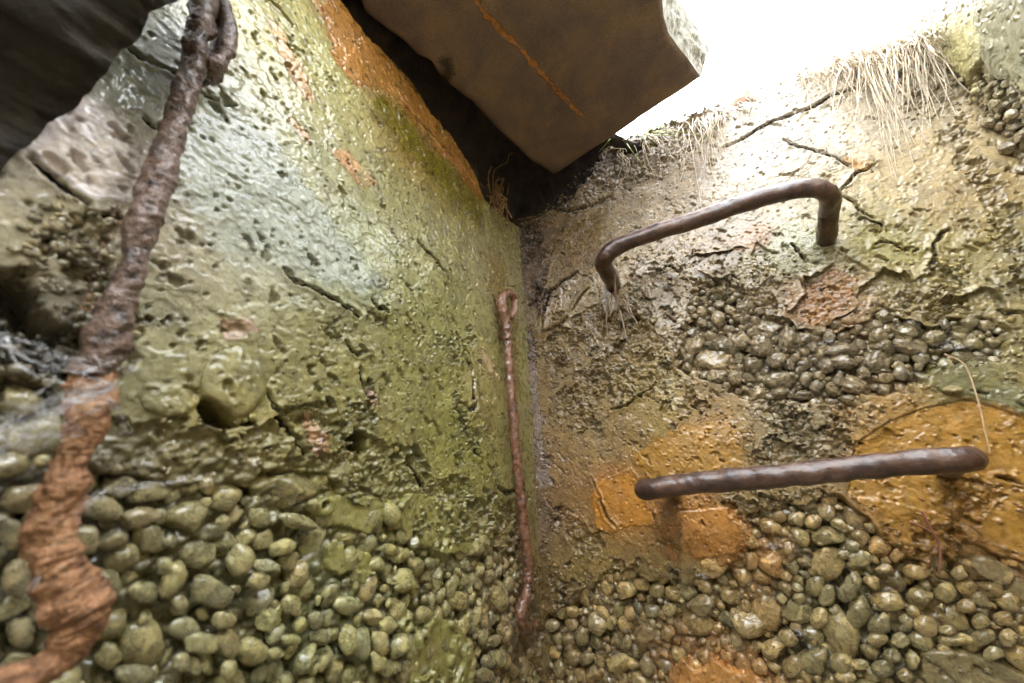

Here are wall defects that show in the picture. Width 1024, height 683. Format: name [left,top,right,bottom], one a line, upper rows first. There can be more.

corrosion [0,0,238,683]
corrosion [221,318,259,340]
crack [283,269,384,318]
corrosion [315,0,484,198]
corrosion [730,223,771,250]
crack [725,88,949,271]
spalling [669,249,1011,406]
spalling [0,376,62,667]
corrosion [484,254,539,637]
spalling [50,472,1024,683]
corrosion [589,416,747,564]
corrosion [847,401,1024,554]